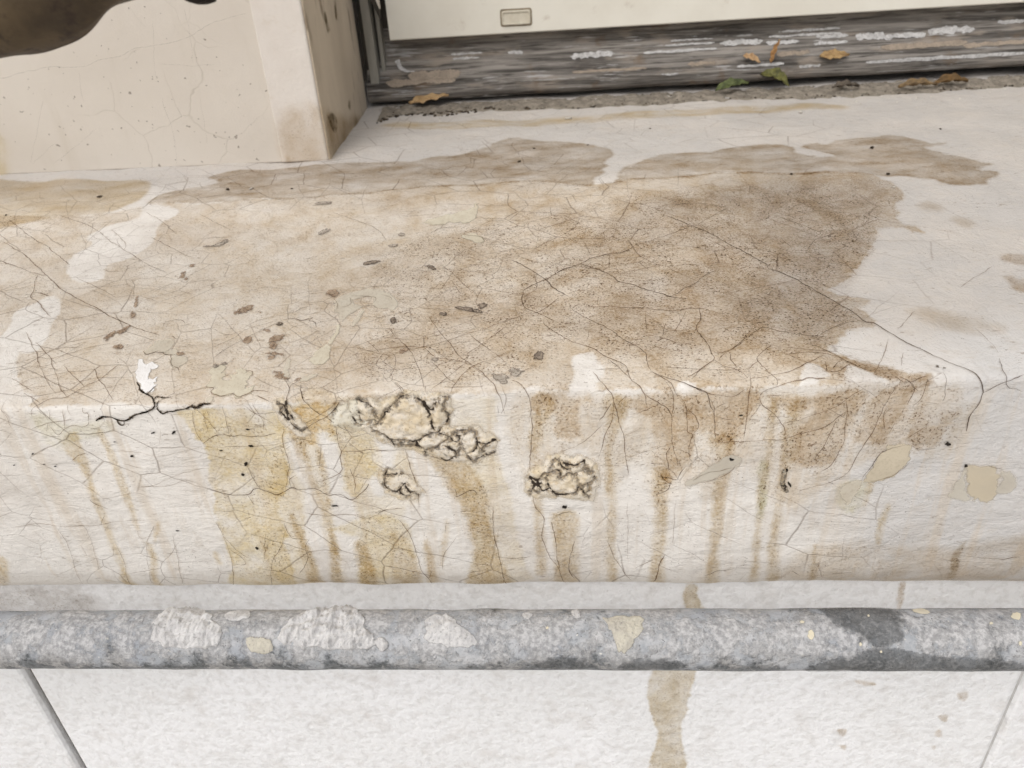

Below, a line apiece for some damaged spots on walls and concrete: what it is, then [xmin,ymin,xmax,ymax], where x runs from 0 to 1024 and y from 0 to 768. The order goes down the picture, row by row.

peeling [135,359,159,393]
crack [1,213,450,582]
crack [373,203,1022,495]
peeling [685,455,741,486]
peeling [864,444,912,482]
peeling [948,465,1016,503]
crack [455,490,575,583]
crack [608,505,674,582]